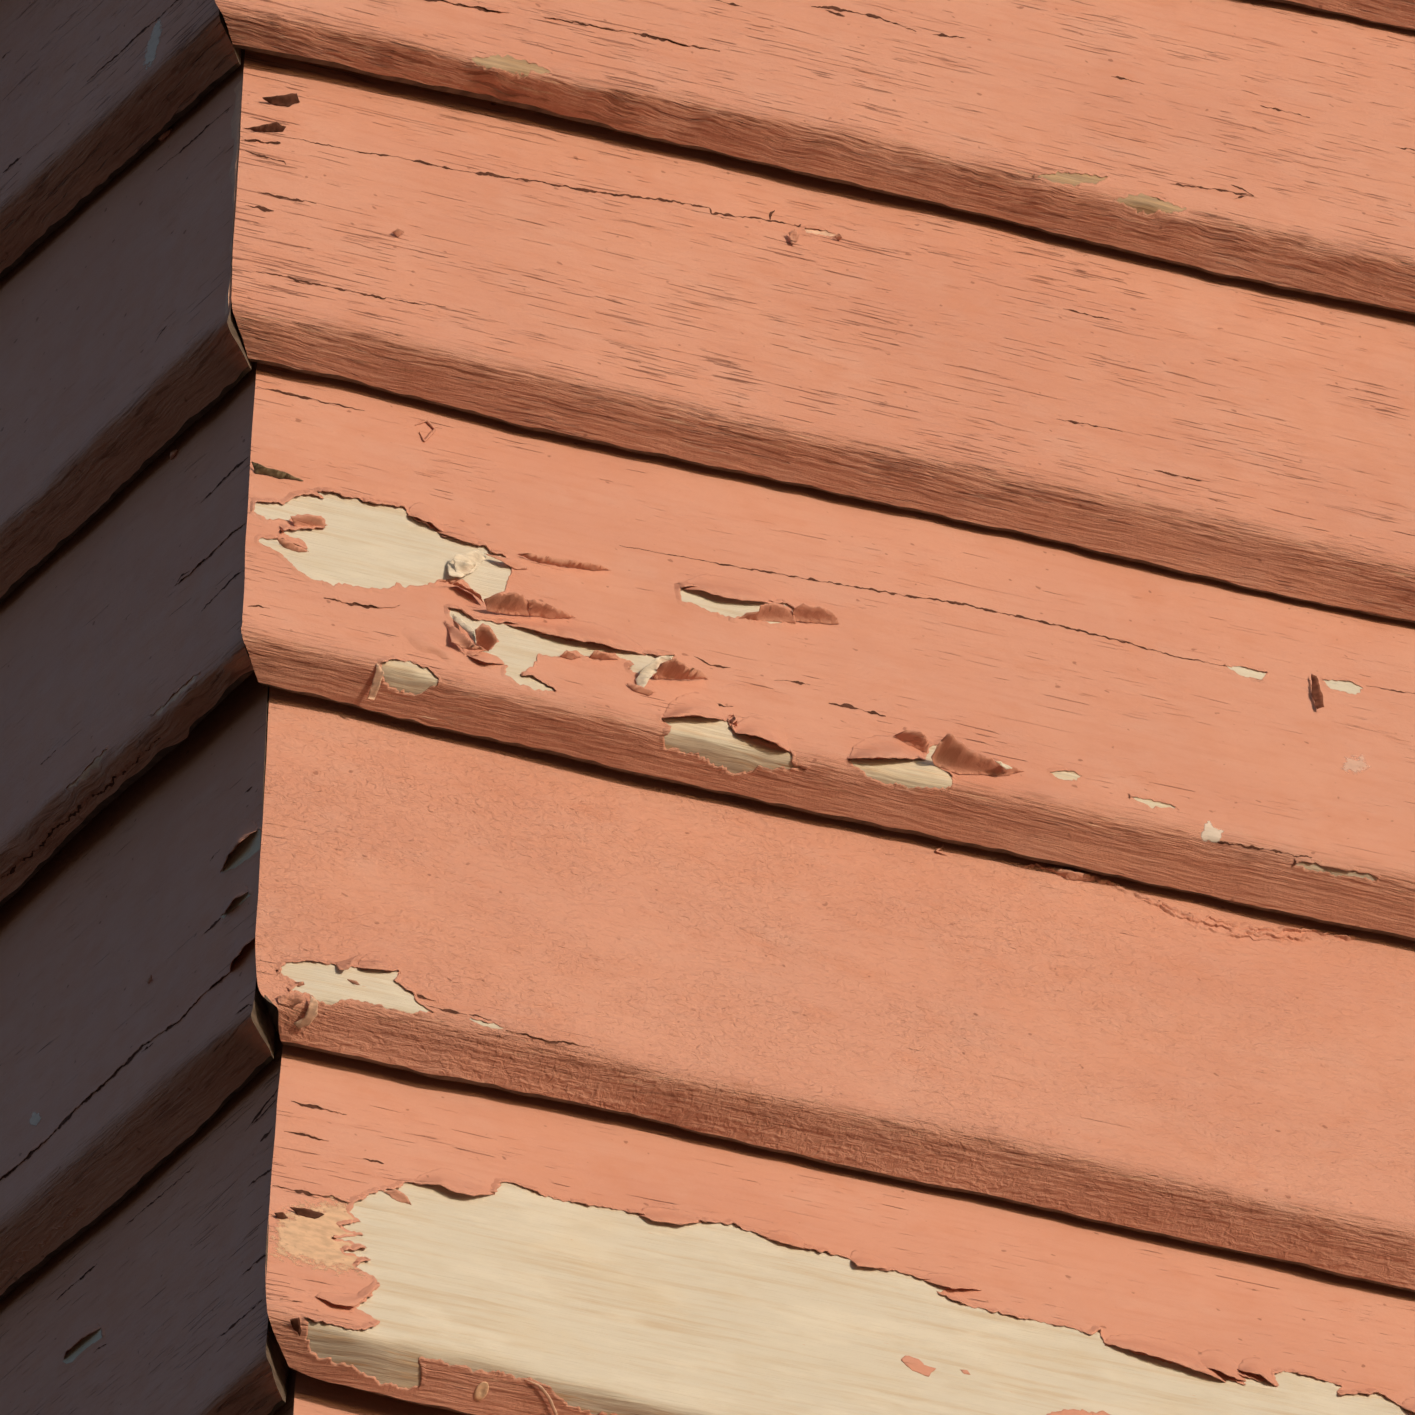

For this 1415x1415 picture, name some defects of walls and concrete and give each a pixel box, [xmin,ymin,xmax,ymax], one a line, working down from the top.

crack [158,107,801,227]
peeling [250,487,812,782]
peeling [674,574,839,628]
peeling [846,730,1024,795]
peeling [220,819,262,923]
peeling [275,952,437,1029]
crack [0,968,252,1180]
peeling [300,1168,1415,1415]
peeling [62,1323,106,1368]